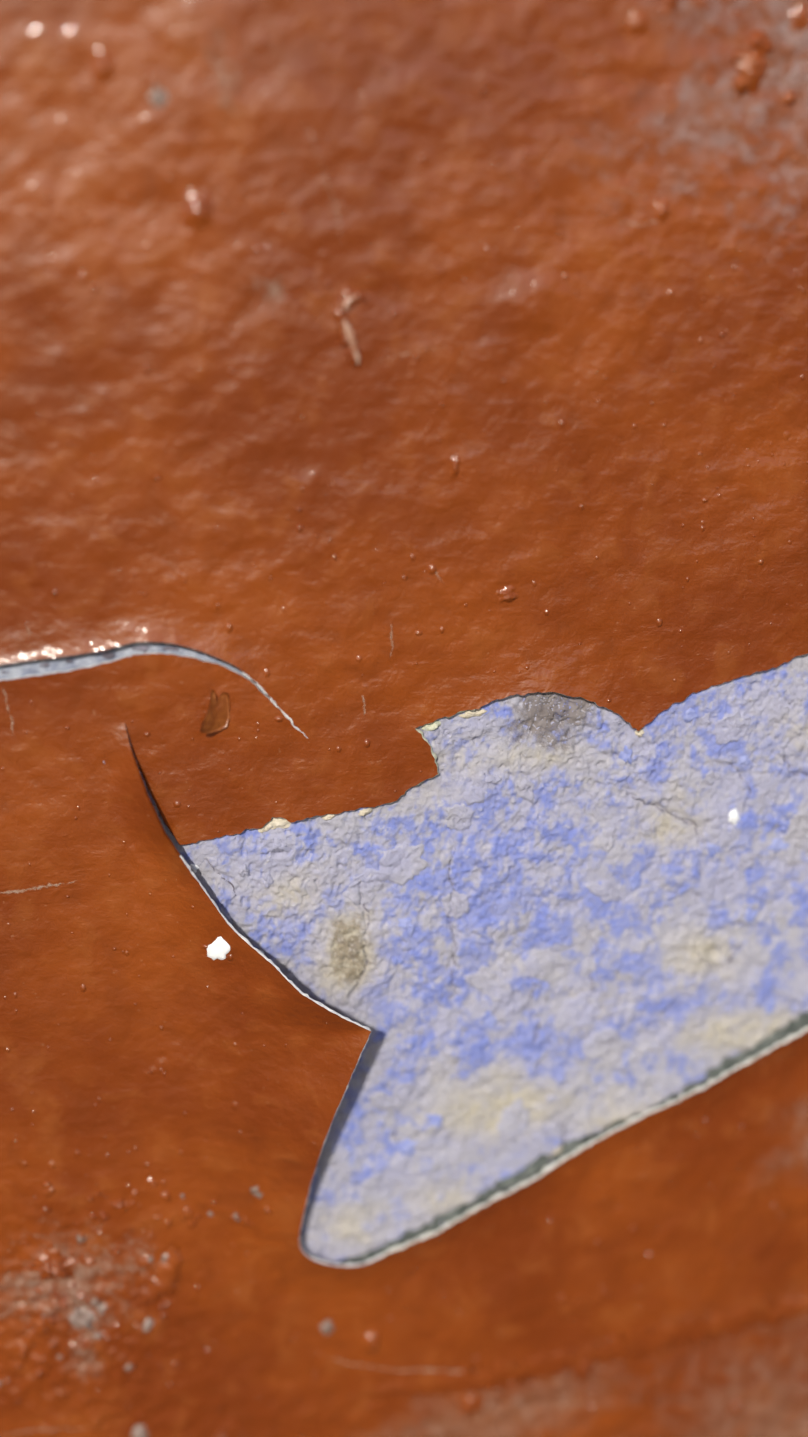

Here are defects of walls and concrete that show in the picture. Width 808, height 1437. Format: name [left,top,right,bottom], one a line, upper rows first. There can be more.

crack [0,642,308,738]
peeling [14,654,808,1380]